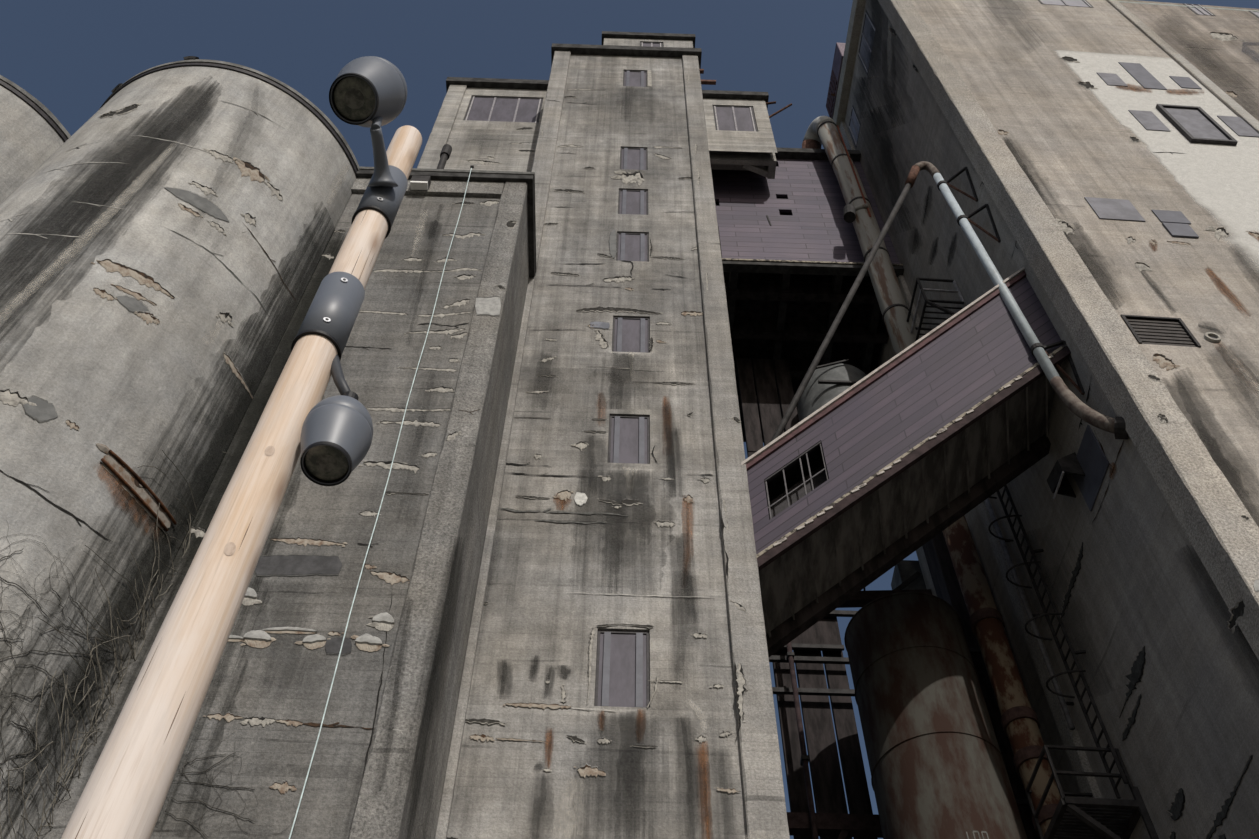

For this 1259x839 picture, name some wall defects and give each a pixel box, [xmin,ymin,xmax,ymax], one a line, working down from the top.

damp [0,82,213,328]
spalling [203,148,283,201]
spalling [91,258,175,324]
spalling [0,387,37,406]
crack [0,470,111,541]
spalling [227,612,395,652]
peeling [1119,646,1146,741]
rust [698,747,710,831]
peeling [1205,755,1253,839]